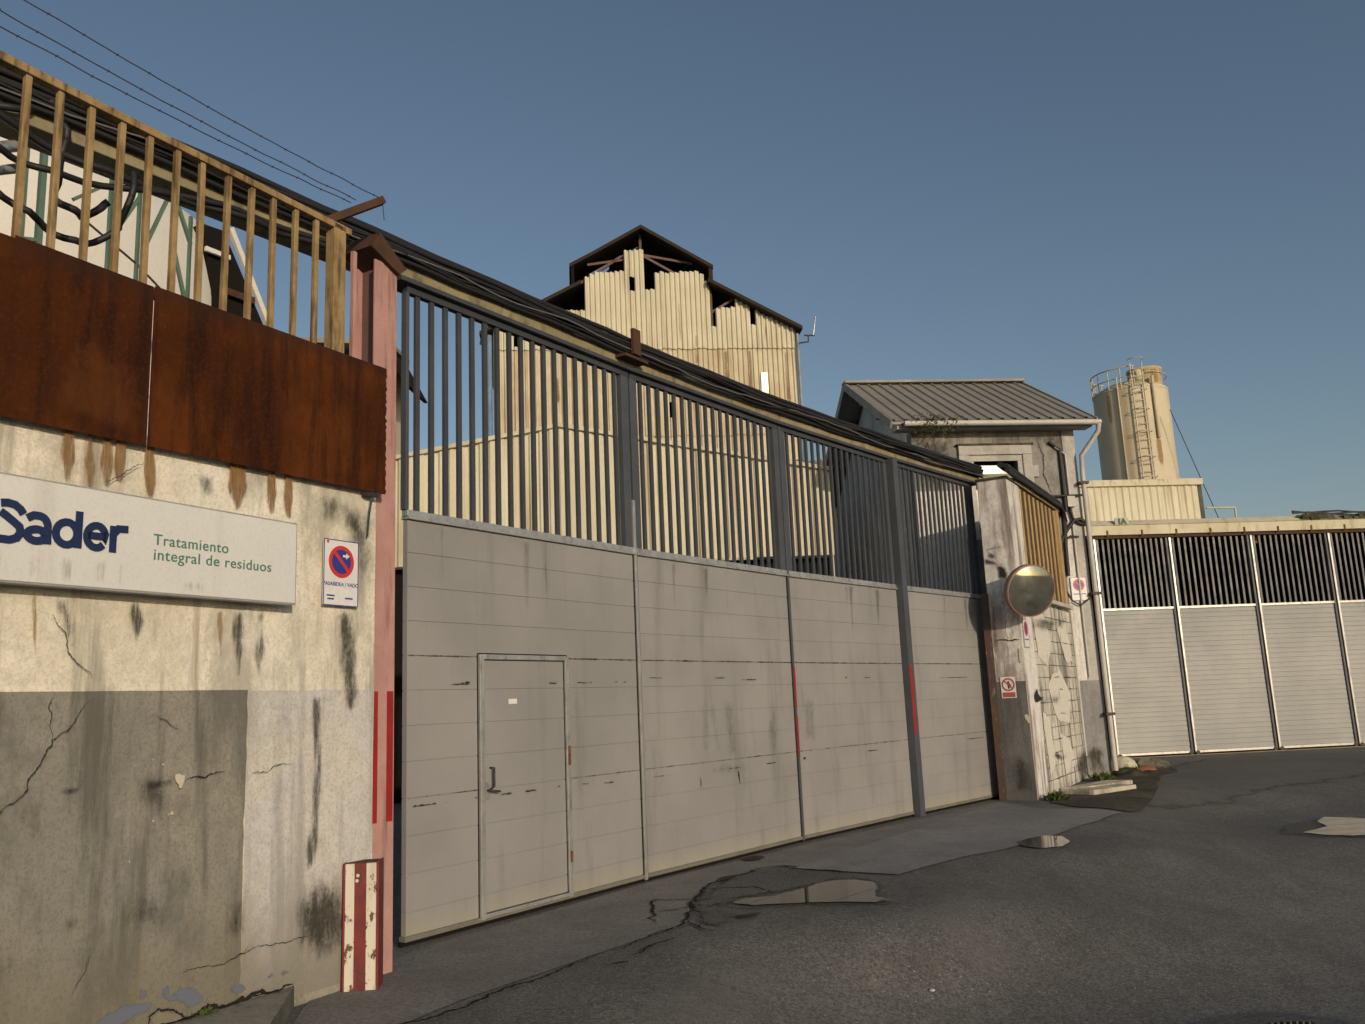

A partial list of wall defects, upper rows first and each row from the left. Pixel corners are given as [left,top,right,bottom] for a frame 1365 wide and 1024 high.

corrosion [0,233,387,517]
crack [0,614,93,813]
damp [308,699,321,865]
damp [341,613,356,708]
damp [302,887,343,950]
peeling [97,987,203,1024]